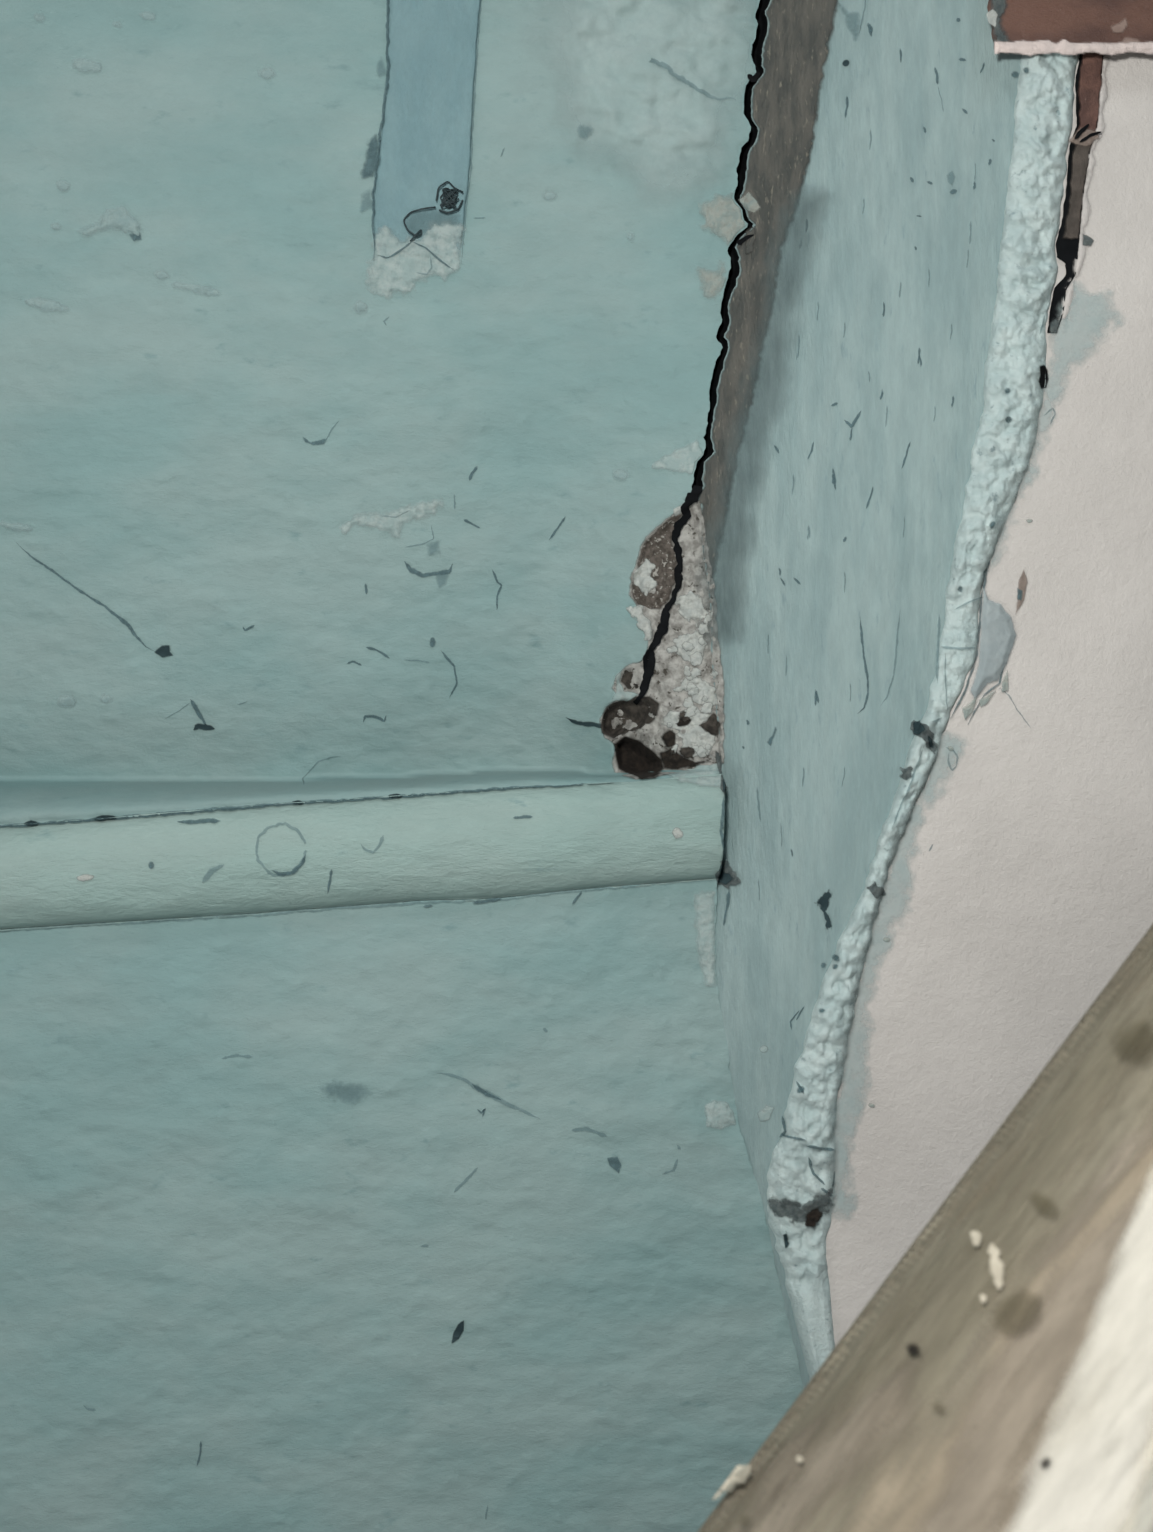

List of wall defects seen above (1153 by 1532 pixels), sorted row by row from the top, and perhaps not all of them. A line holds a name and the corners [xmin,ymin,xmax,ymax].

crack [633,0,770,705]
peeling [567,0,849,786]